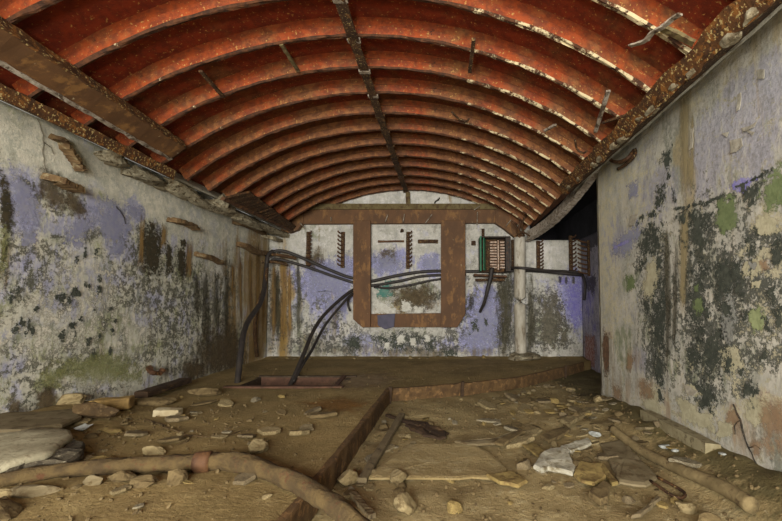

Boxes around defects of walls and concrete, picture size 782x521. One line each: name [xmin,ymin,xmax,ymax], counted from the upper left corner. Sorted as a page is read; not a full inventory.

leakage [0,170,16,263]
mould [10,306,39,337]
mould [58,316,84,346]
mould [54,274,117,336]
leakage [137,221,248,380]
rust [230,244,292,339]
leakage [296,247,324,331]
mould [343,328,460,357]
leakage [391,283,440,313]
leakage [468,273,514,353]
leakage [635,102,782,457]
crack [733,404,760,464]